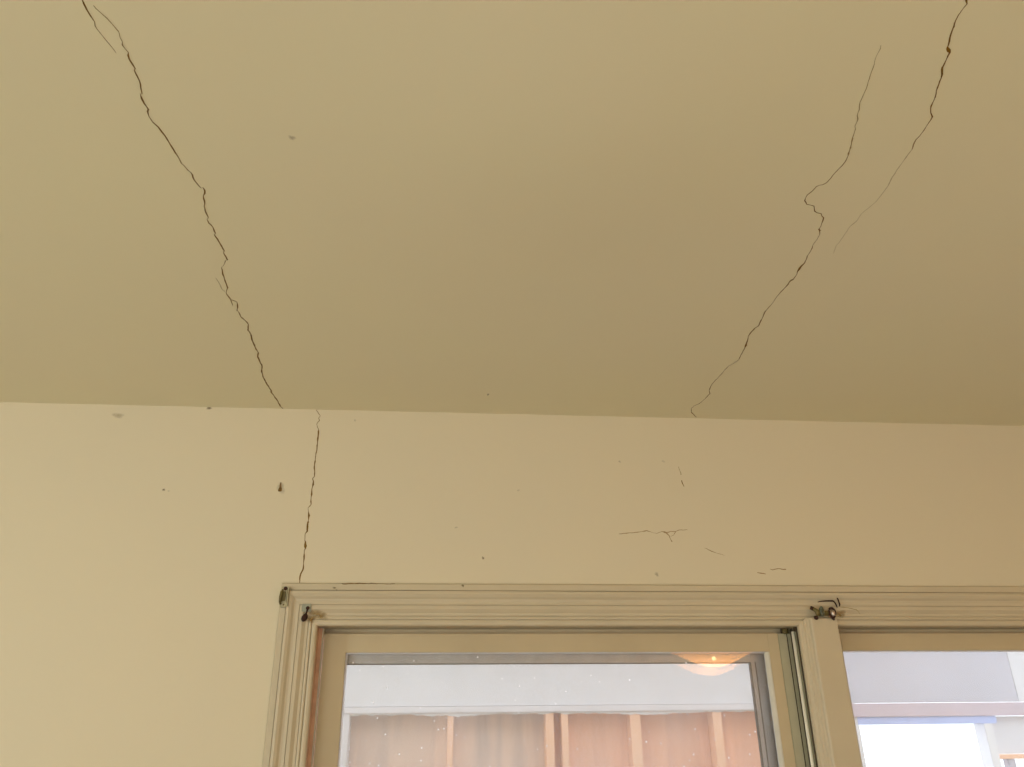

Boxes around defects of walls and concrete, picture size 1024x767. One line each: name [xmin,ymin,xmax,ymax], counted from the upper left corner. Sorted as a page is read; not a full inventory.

crack [82,0,283,409]
crack [691,0,968,417]
crack [299,410,320,583]
crack [621,530,679,542]